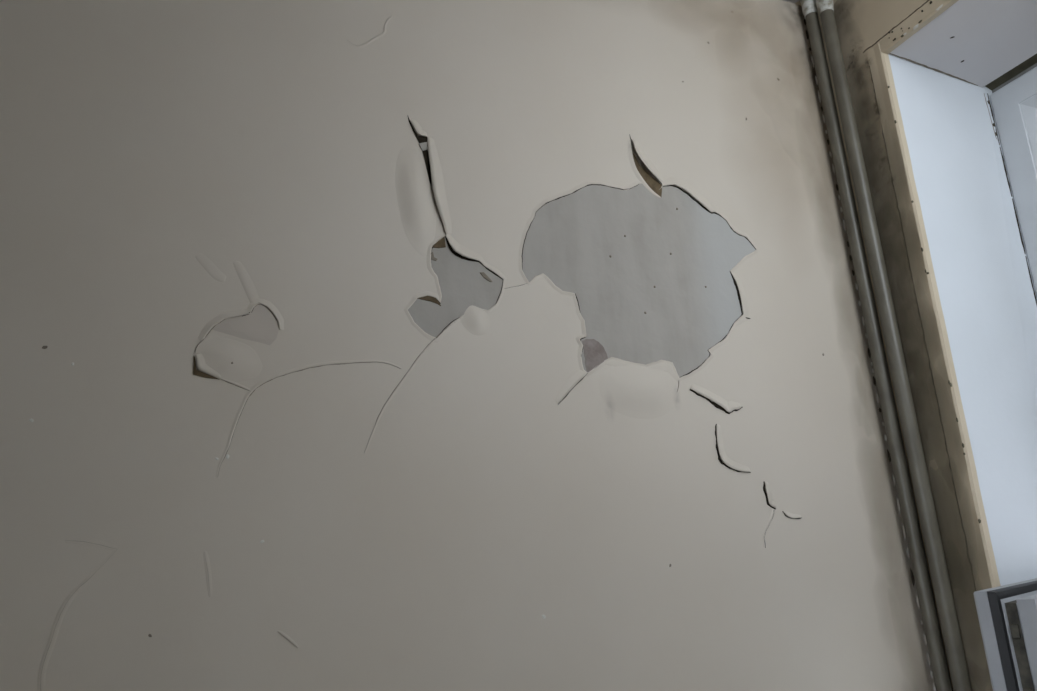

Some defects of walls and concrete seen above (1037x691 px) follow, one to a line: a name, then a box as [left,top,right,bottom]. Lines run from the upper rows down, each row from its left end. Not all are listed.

peeling [404,134,759,419]
crack [677,381,801,548]